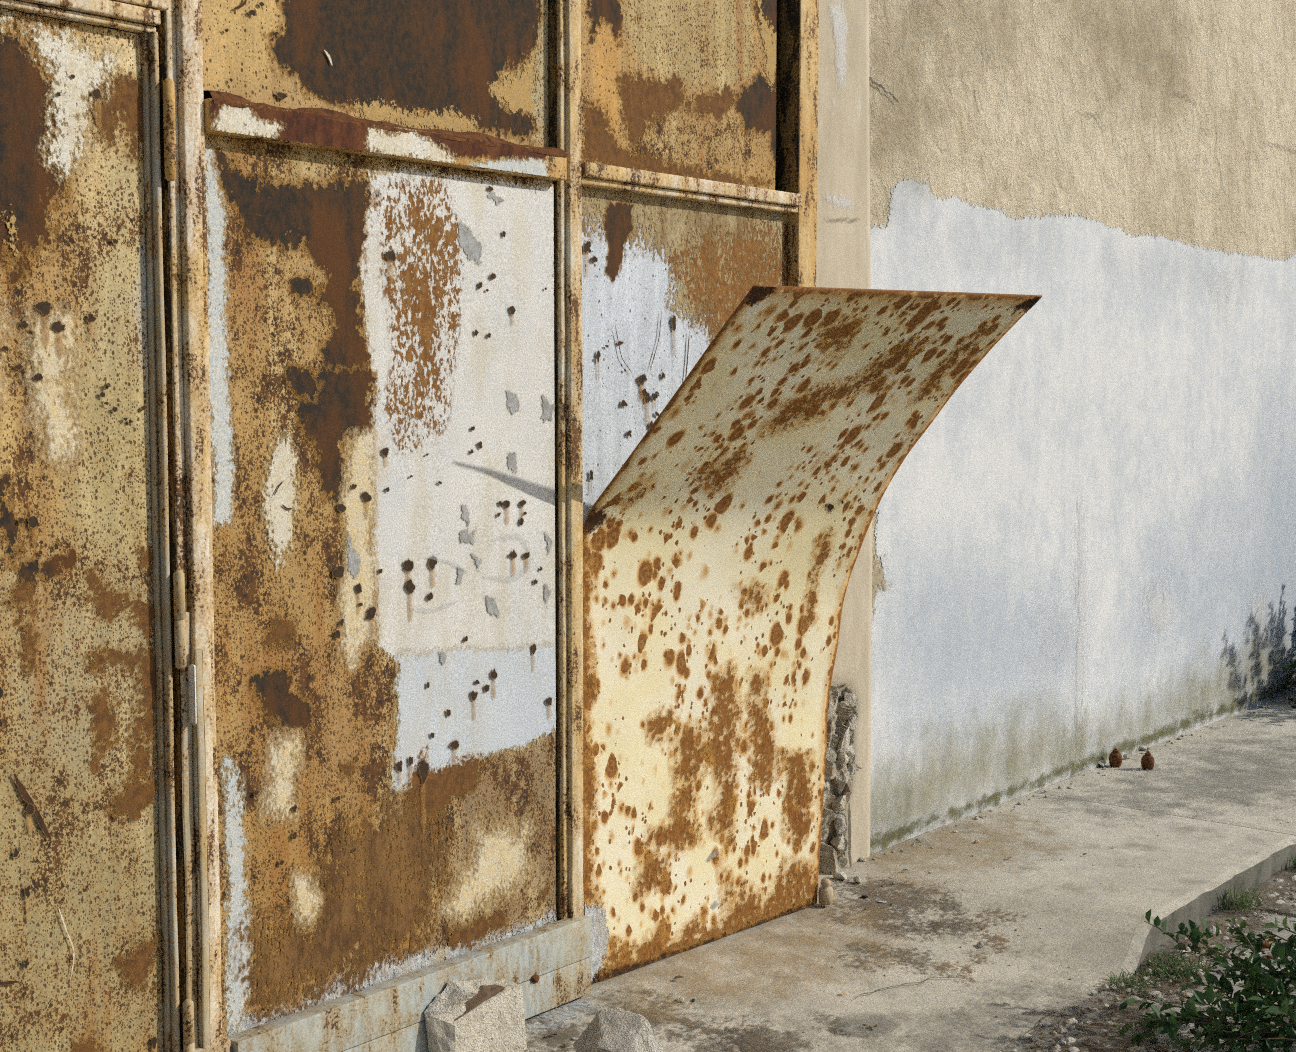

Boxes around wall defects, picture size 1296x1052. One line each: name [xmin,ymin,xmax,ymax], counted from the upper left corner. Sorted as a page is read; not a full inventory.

rust [0,22,72,286]
rust [203,0,777,187]
rust [212,147,462,517]
peeling [333,96,556,794]
rust [757,335,923,438]
rust [1011,296,1041,313]
rust [0,469,159,821]
rust [250,611,313,739]
rust [233,746,509,1023]
rust [583,507,607,909]
rust [591,660,819,984]
water stain [1064,732,1296,815]